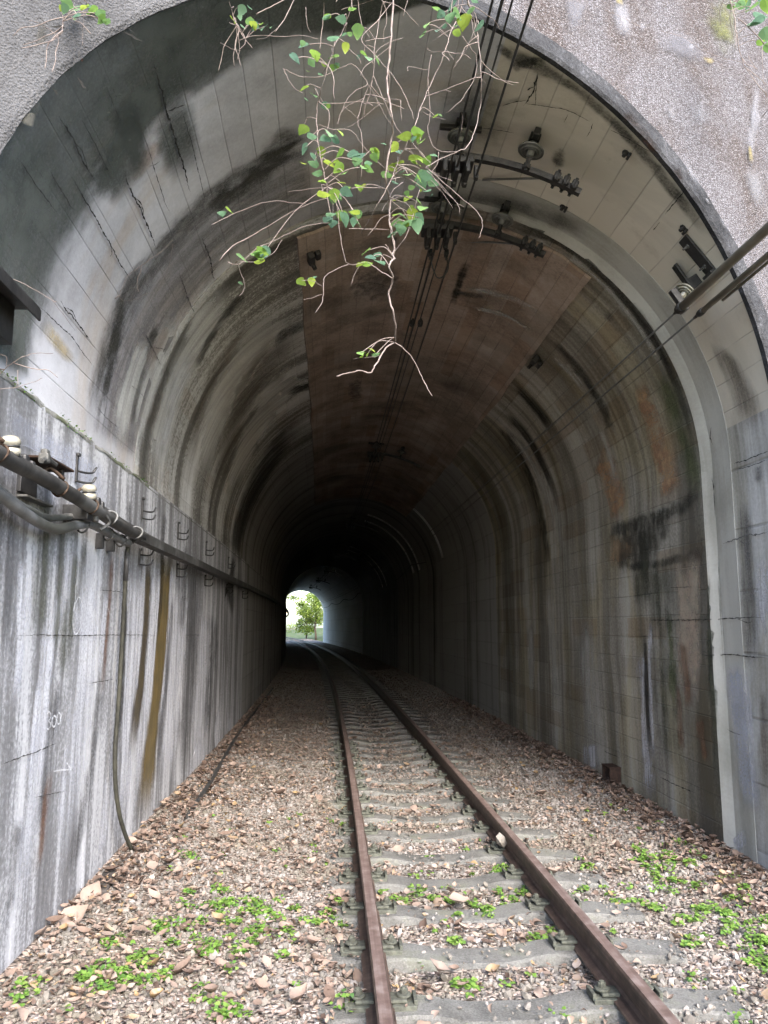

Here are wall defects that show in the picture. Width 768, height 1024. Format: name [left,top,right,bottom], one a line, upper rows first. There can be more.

crack [21,28,205,275]
leakage [99,105,142,195]
leakage [160,111,194,164]
crack [484,74,652,153]
leakage [96,131,298,396]
leakage [117,297,242,481]
leakage [195,322,309,551]
leakage [616,494,700,596]
leakage [14,537,111,863]
corrosion [132,562,172,794]
leakage [162,551,231,774]